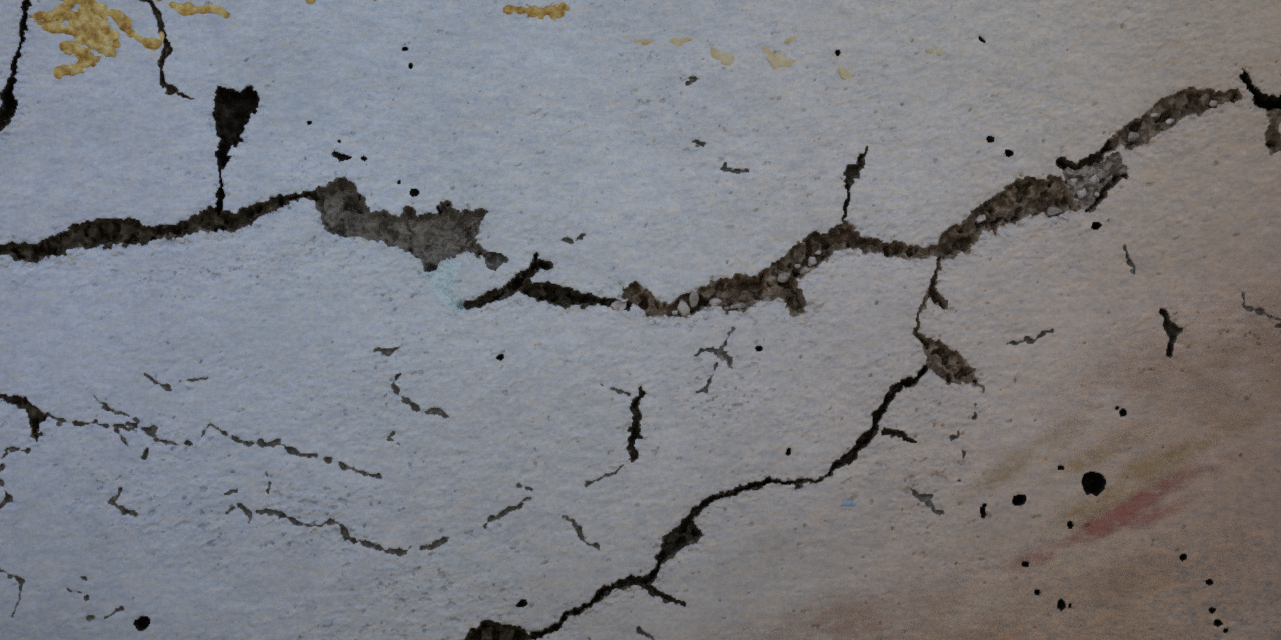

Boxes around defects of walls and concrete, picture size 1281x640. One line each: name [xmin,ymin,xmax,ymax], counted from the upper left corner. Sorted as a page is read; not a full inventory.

crack [680,76,700,86]
crack [0,0,319,268]
crack [1242,292,1281,328]
crack [144,373,208,391]
crack [373,346,450,446]
crack [464,86,1243,640]
crack [0,394,449,557]
crack [0,569,25,618]
crack [67,576,124,622]